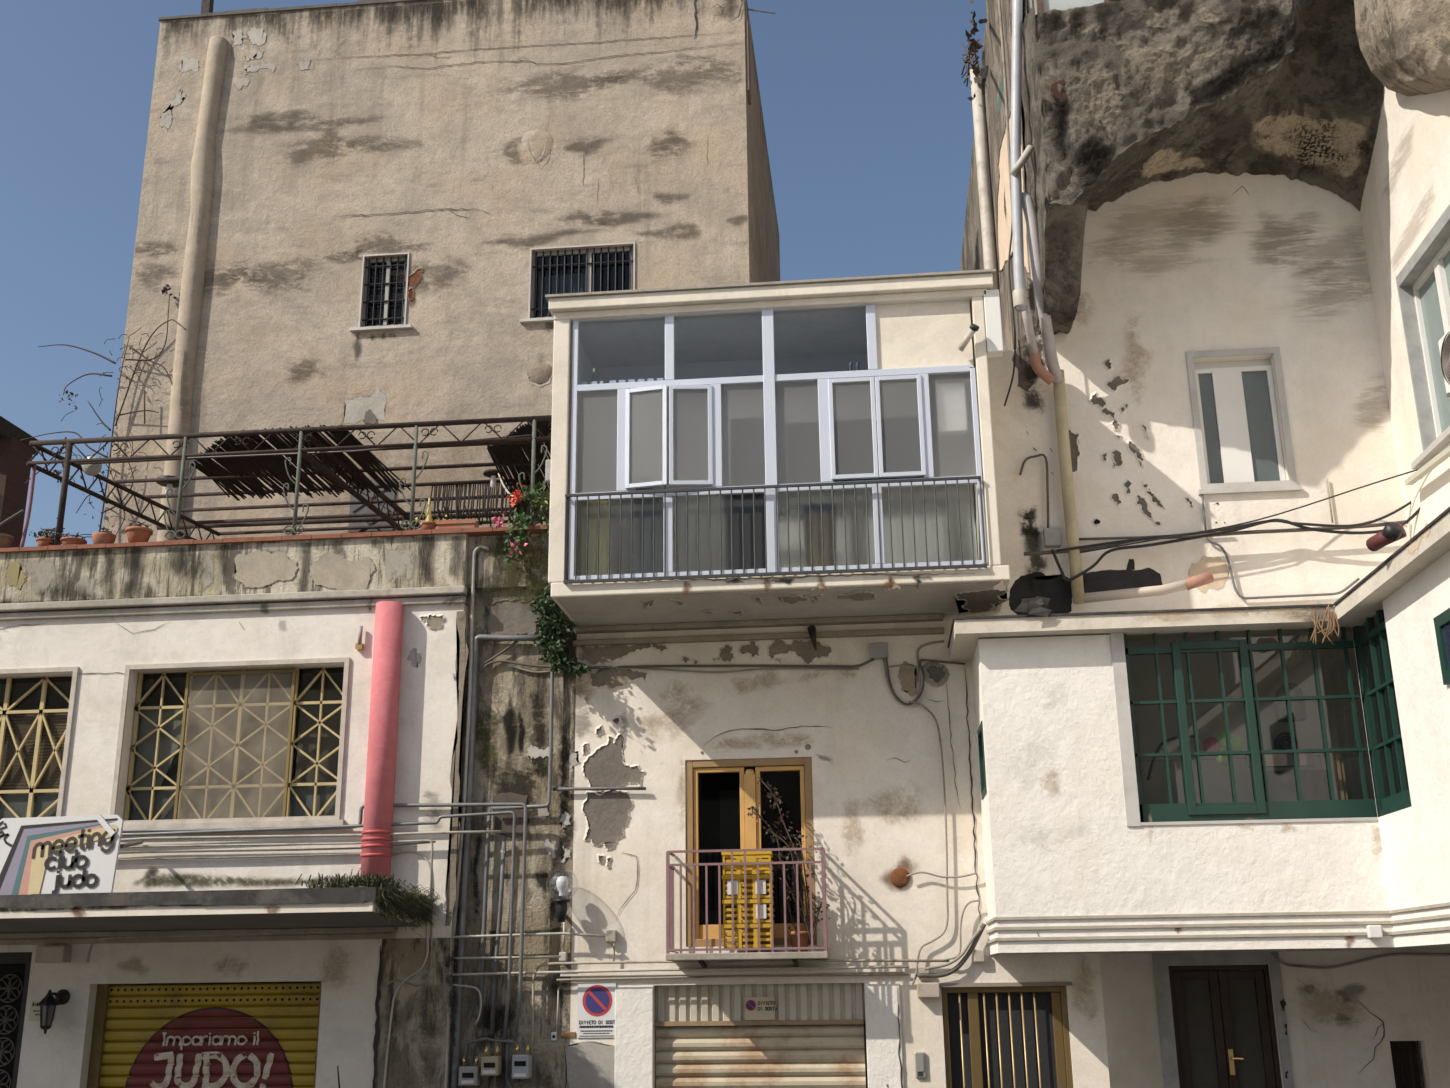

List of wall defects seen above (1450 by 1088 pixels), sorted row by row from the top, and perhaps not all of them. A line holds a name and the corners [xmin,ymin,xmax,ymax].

water stain [316,0,481,24]
peeling [232,27,276,90]
peeling [1068,428,1082,475]
peeling [1089,357,1167,528]
water stain [0,549,158,604]
water stain [300,543,310,592]
peeling [234,543,414,591]
water stain [419,537,434,580]
peeling [578,639,834,691]
water stain [476,694,573,856]
peeling [493,716,646,869]
water stain [489,872,563,934]